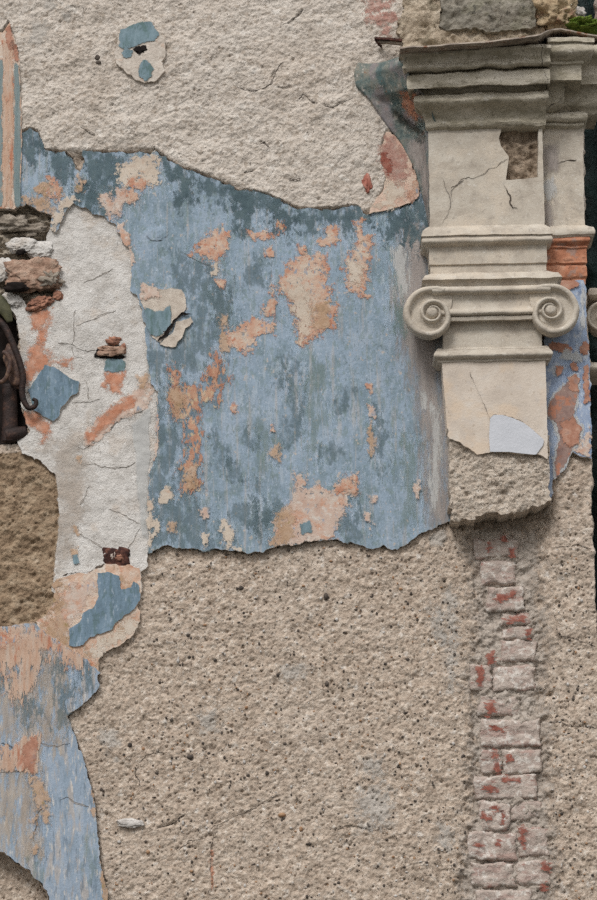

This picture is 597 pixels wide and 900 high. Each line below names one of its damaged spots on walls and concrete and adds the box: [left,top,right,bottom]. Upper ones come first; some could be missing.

crack [444,159,517,218]
flaking render [499,130,538,180]
peeling [0,19,451,900]
peeling [489,280,592,498]